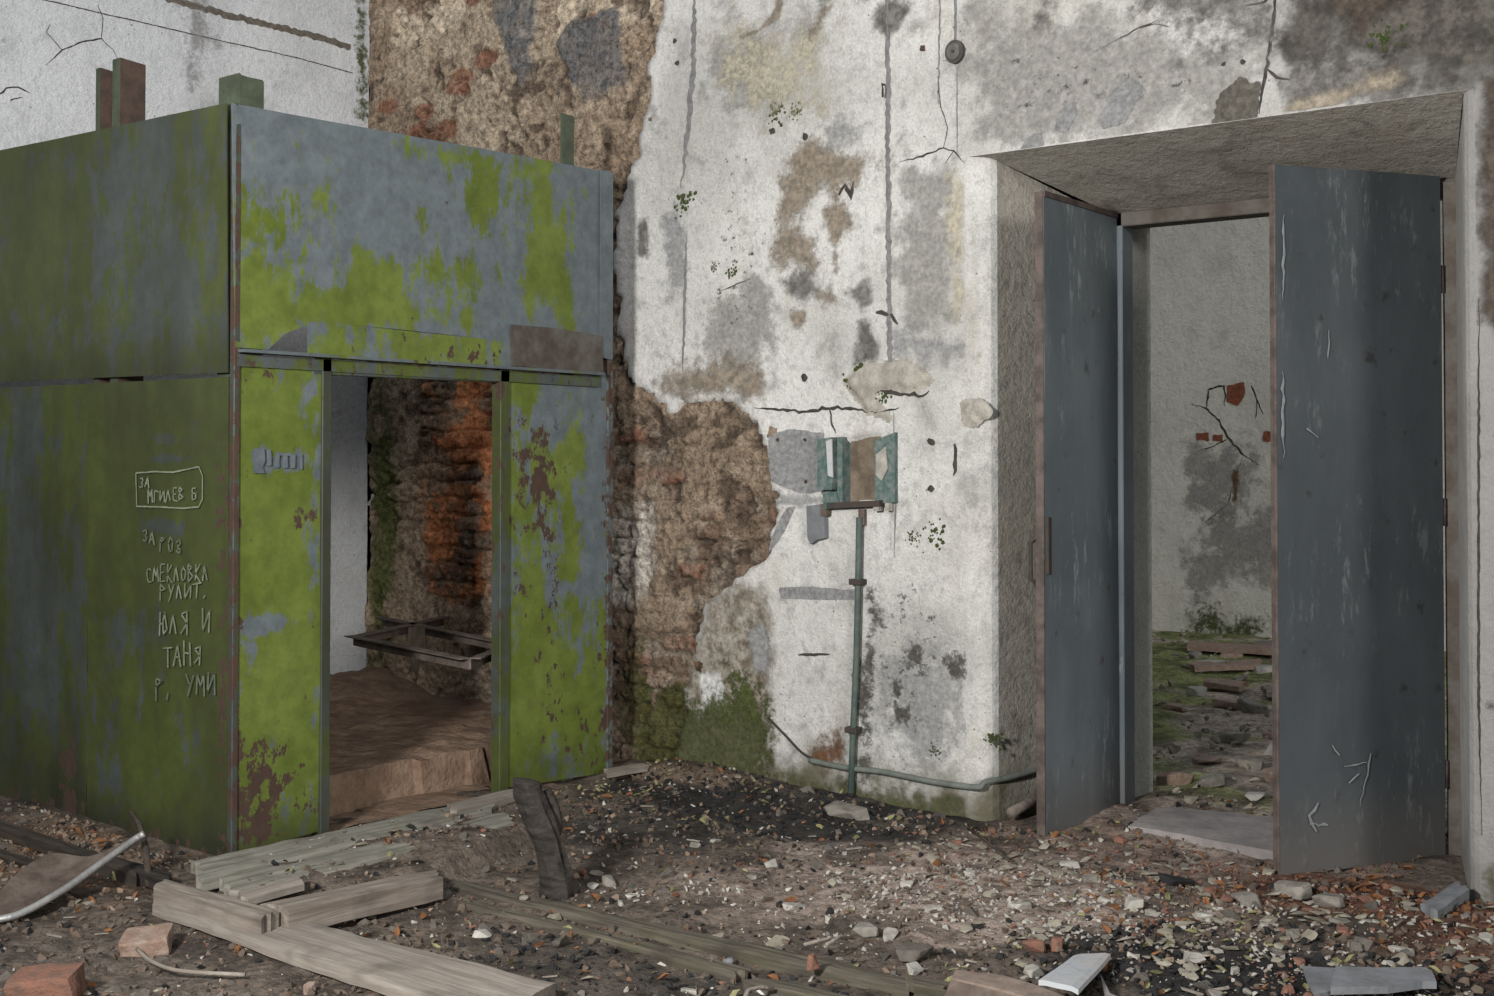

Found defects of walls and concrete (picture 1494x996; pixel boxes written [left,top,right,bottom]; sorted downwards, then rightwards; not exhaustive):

crack [0,0,353,101]
flaking render [367,0,664,252]
peeling [711,157,754,324]
water stain [652,0,866,402]
water stain [851,280,878,365]
water stain [875,0,909,36]
water stain [964,0,1494,323]
crack [1247,0,1289,114]
crack [754,389,929,433]
flaking render [365,362,492,703]
flaking render [612,270,788,779]
water stain [677,710,774,777]